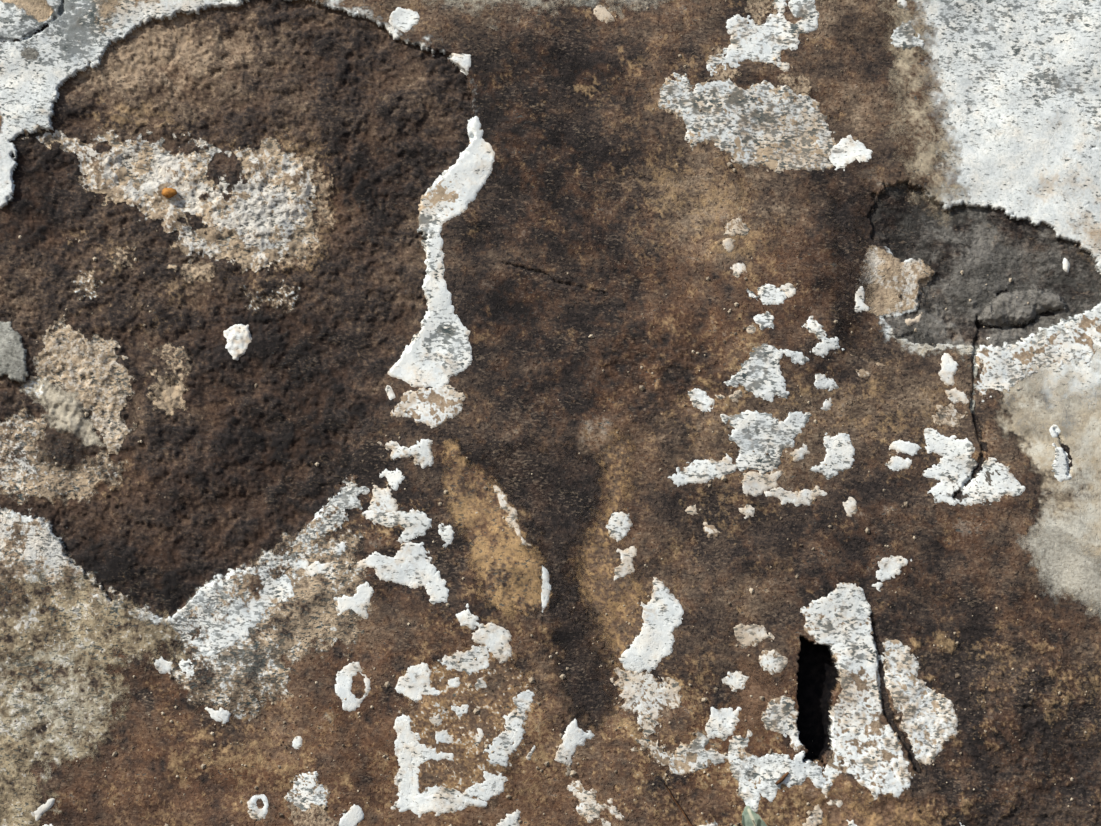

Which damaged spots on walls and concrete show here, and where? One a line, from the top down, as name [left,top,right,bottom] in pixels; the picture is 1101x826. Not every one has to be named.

water stain [21,47,39,60]
water stain [724,0,964,332]
water stain [561,477,608,610]
peeling [668,316,855,519]
peeling [746,283,796,334]
spalling [855,181,1101,506]
crack [953,310,1060,499]
water stain [994,372,1101,614]
peeling [554,719,625,826]
water stain [583,616,619,682]
peeling [610,556,959,826]
crack [871,613,920,772]